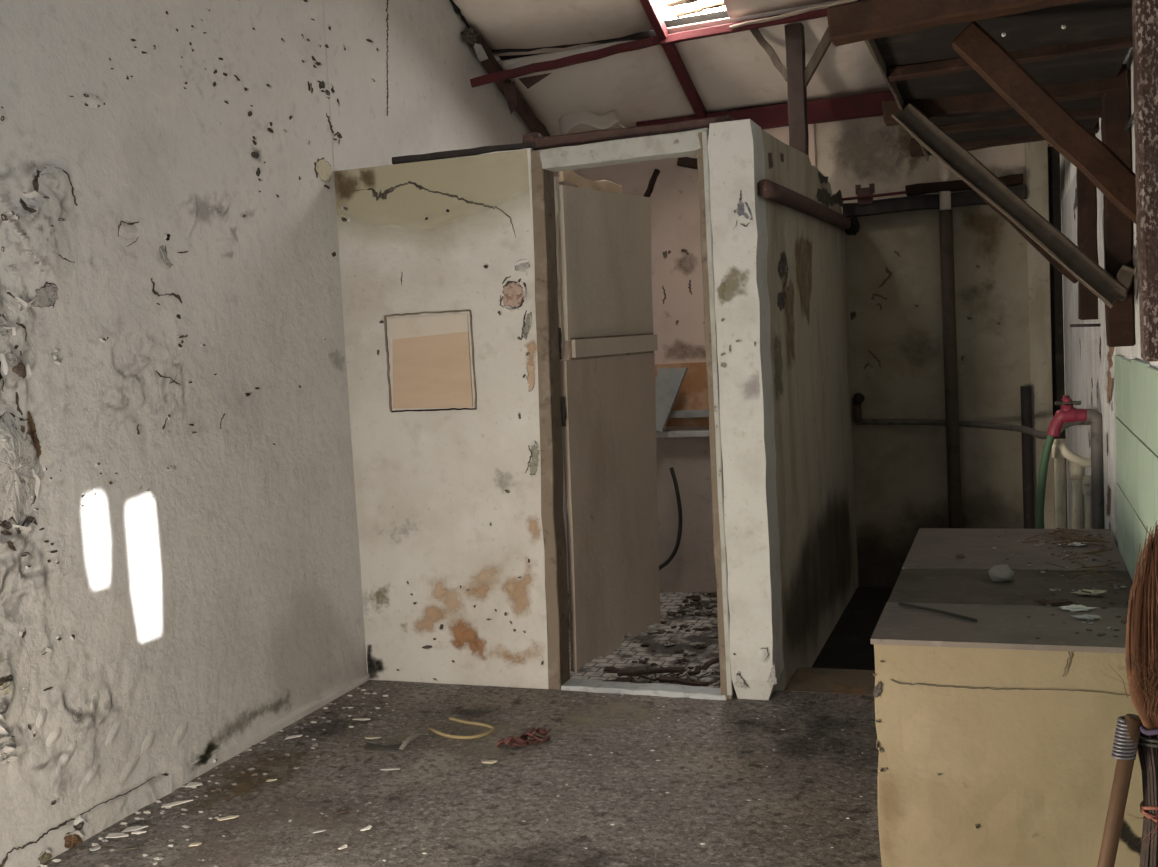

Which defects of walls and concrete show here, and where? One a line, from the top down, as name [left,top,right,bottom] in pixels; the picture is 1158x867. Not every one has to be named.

crack [345,181,516,237]
spalling [497,260,535,392]
leakage [774,240,812,398]
spalling [0,314,61,569]
spalling [525,441,540,477]
spalling [0,675,25,695]
peeling [0,714,17,764]
leakage [198,744,216,765]
crack [0,776,155,867]